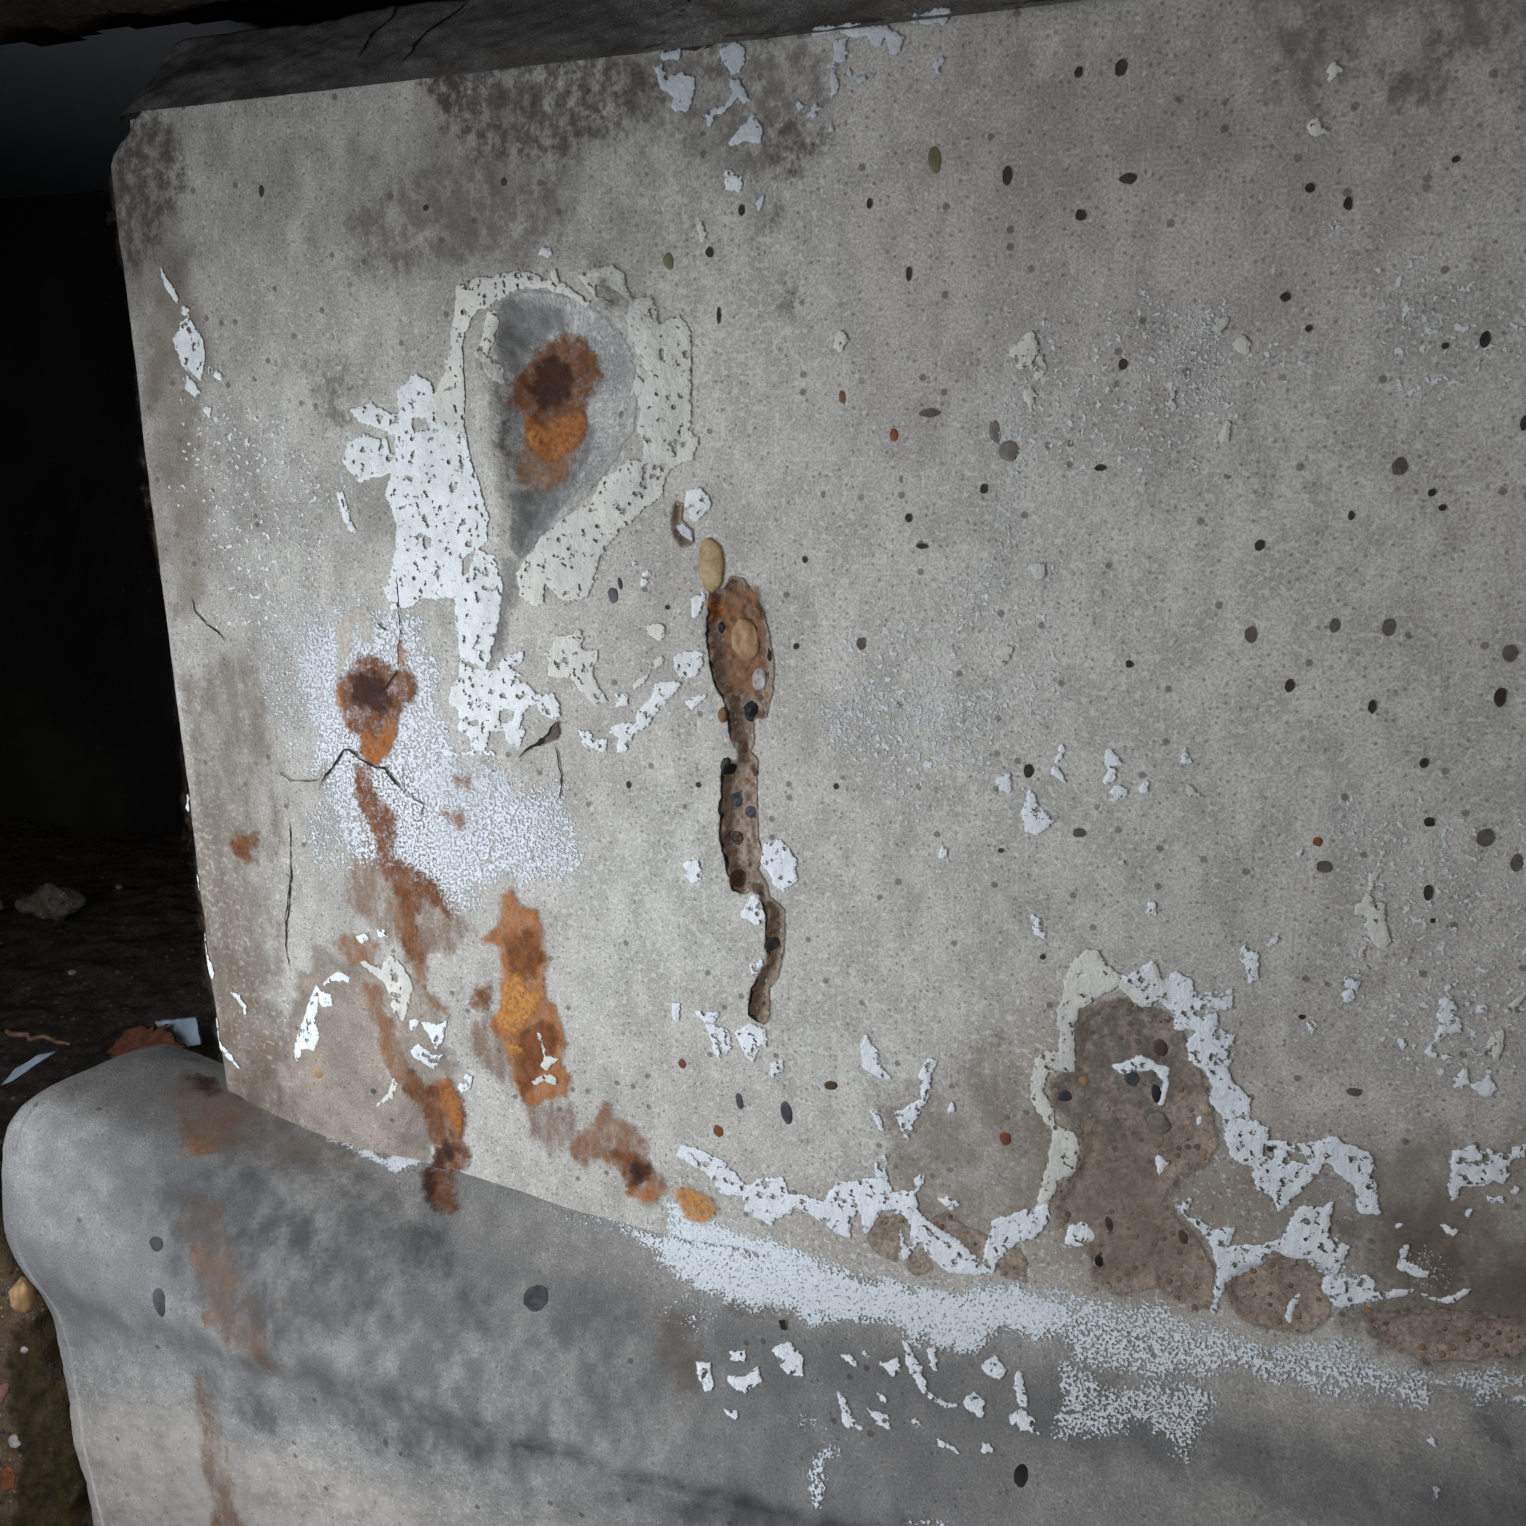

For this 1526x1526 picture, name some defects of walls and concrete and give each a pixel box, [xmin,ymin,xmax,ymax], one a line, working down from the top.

damp [429,49,713,157]
rust [508,334,603,490]
peeling [342,247,797,1080]
crack [278,749,424,817]
crack [283,820,292,968]
rust [336,608,471,1214]
peeling [294,929,447,1069]
damp [326,1137,422,1174]
rust [470,890,716,1223]
peeling [676,933,1471,1335]
peeling [665,1293,762,1393]
damp [536,1201,1526,1464]